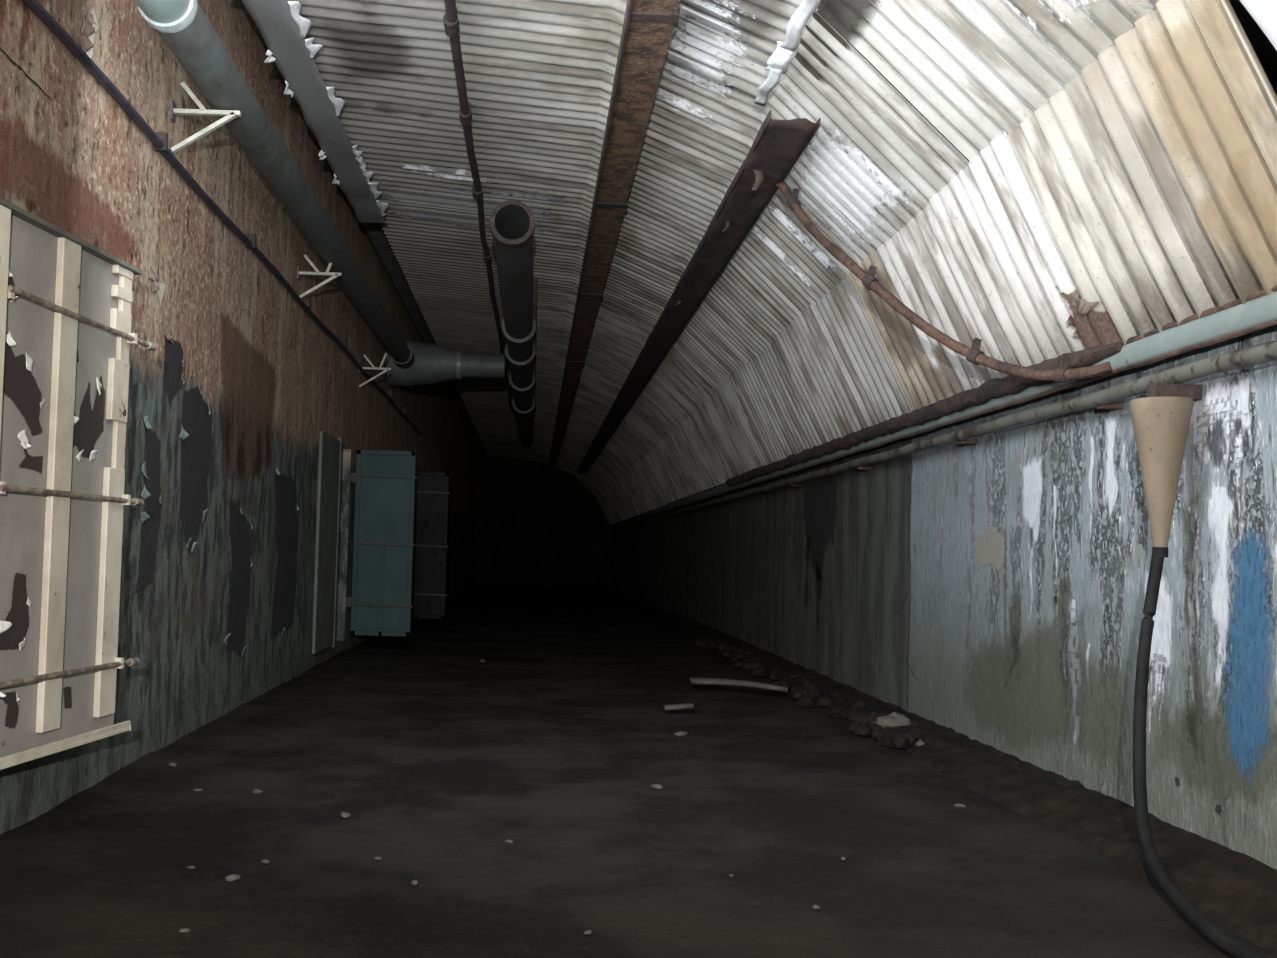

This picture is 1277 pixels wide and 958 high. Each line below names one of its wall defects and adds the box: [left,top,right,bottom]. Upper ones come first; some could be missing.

rust [865,271,956,397]
peeling [3,331,45,474]
peeling [72,376,105,462]
peeling [0,573,32,652]
peeling [0,691,20,729]
peeling [63,686,72,709]